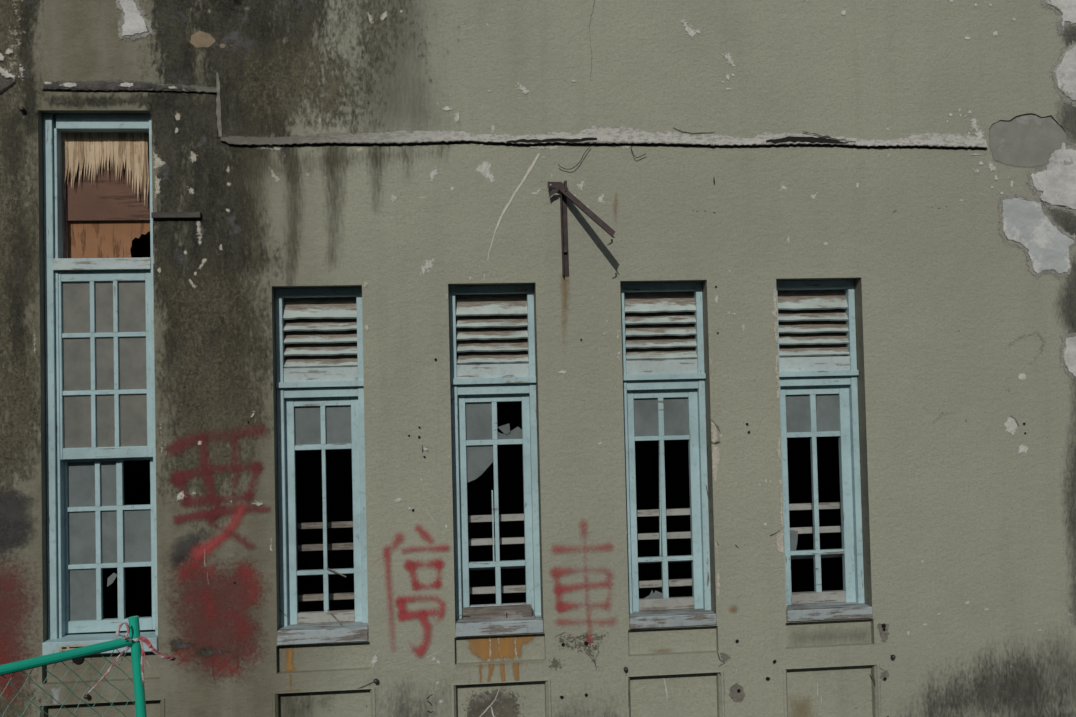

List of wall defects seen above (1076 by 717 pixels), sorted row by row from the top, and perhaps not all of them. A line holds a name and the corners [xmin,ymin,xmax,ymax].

flaking render [0,48,25,94]
peeling [115,0,155,41]
peeling [1041,0,1076,108]
crack [42,72,1066,277]
peeling [971,142,1076,279]
damp [0,0,404,533]
crack [465,690,499,717]